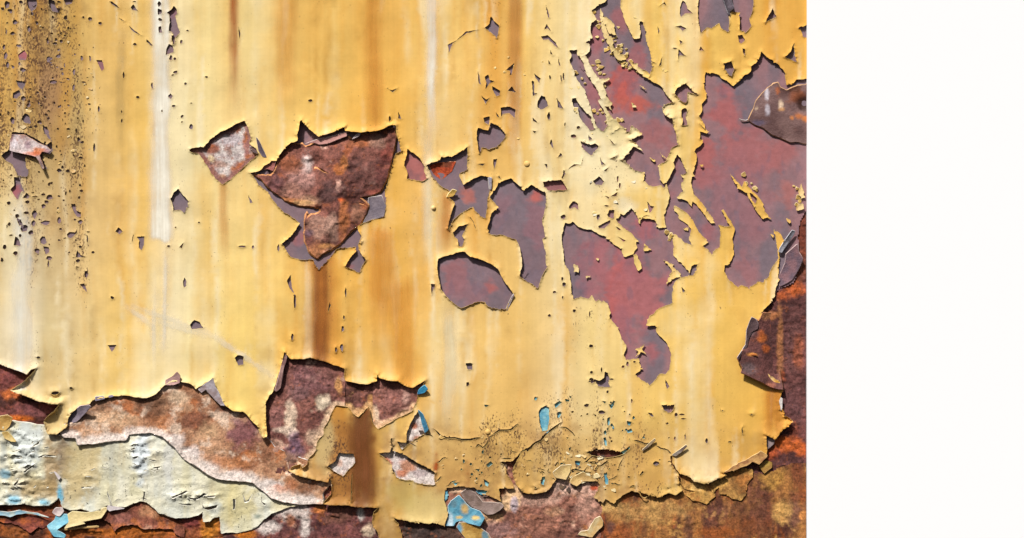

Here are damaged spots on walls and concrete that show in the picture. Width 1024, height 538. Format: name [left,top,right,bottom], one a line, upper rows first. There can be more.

peeling [0,0,104,292]
rust [0,211,806,538]
peeling [187,0,807,501]